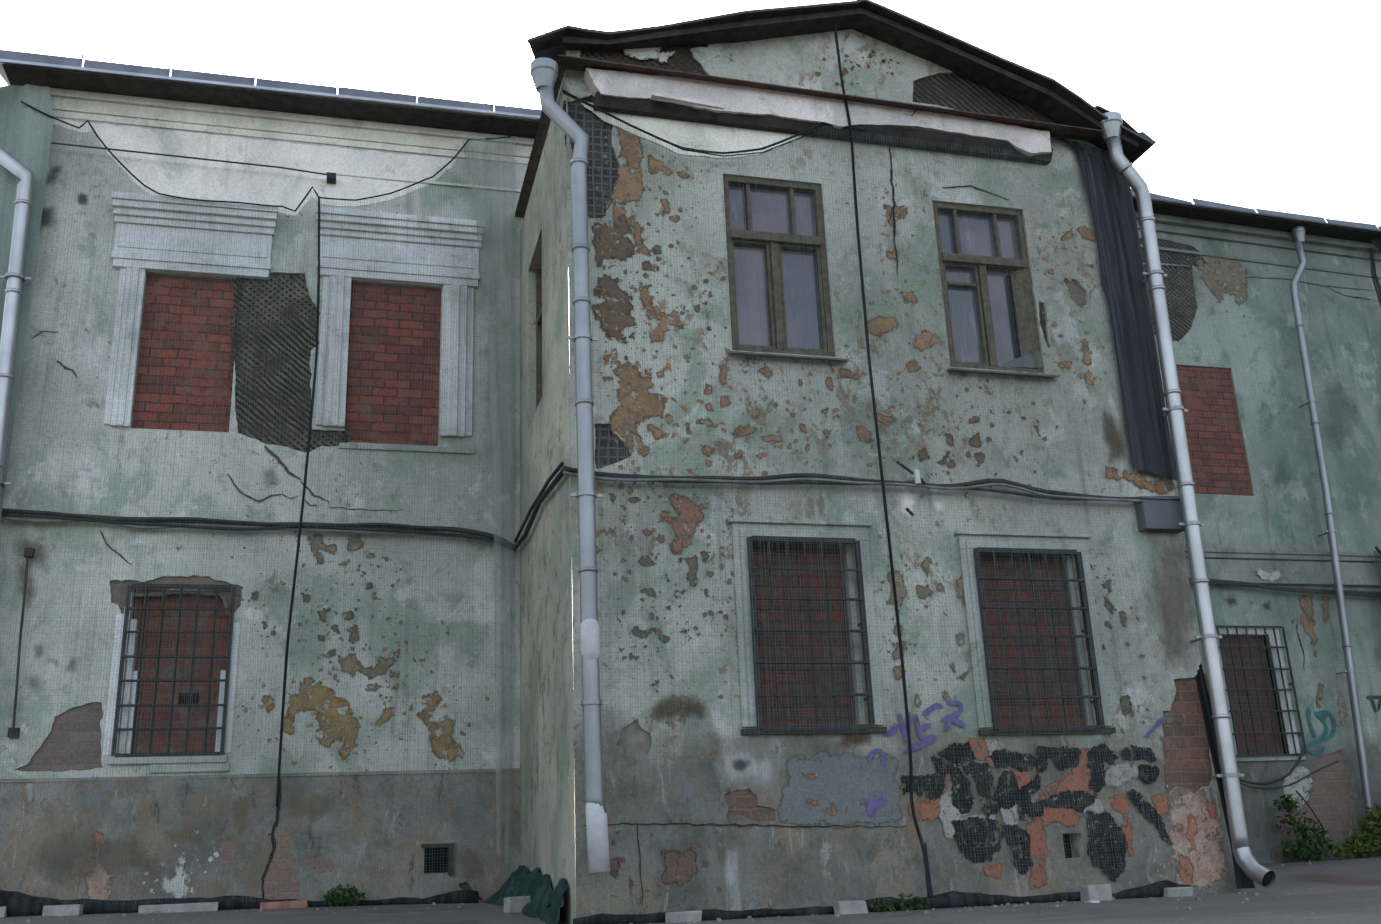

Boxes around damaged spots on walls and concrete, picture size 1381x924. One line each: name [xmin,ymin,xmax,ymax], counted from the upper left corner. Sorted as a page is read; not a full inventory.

peeling [624,47,675,62]
peeling [815,40,901,96]
crack [888,146,898,273]
peeling [1139,238,1256,319]
peeling [591,121,1107,697]
crack [227,445,397,511]
peeling [110,531,479,785]
peeling [876,531,971,730]
peeling [1090,552,1147,680]
flaking render [16,702,104,772]
crack [261,779,282,899]
flaking render [1112,673,1228,890]